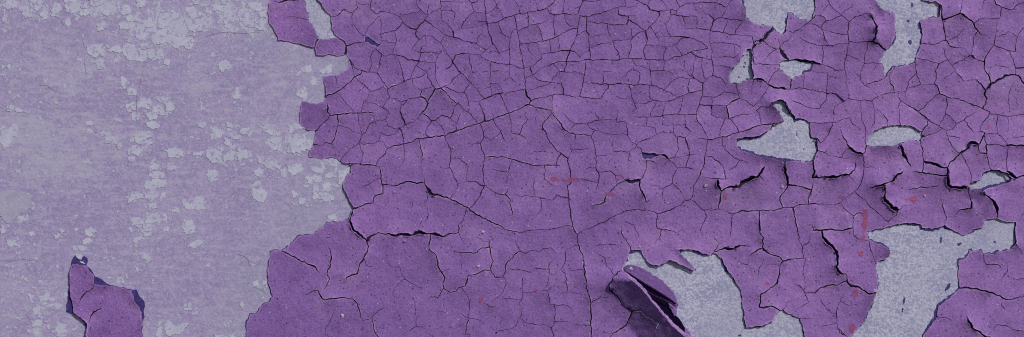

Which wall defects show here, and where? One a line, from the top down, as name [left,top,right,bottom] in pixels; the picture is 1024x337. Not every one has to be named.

peeling [0,0,395,337]
crack [275,0,1024,337]
peeling [709,0,1012,194]
peeling [609,249,805,337]
peeling [822,218,1016,337]